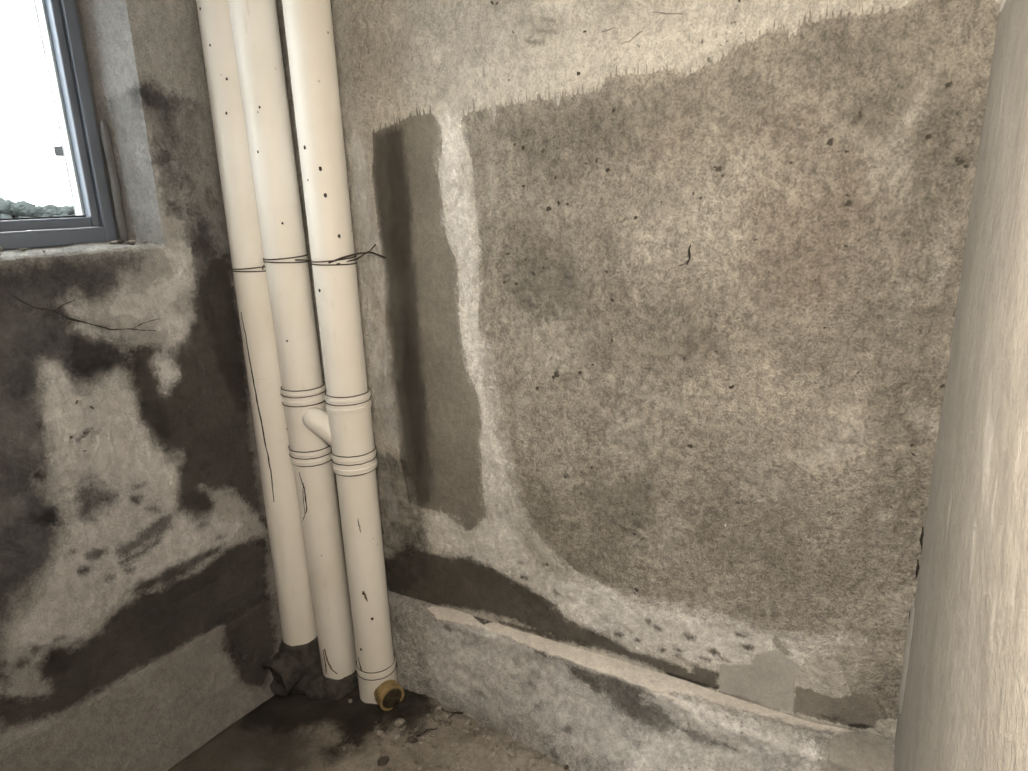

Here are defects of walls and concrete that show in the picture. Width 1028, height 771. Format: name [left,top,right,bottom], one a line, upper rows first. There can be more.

leakage [139,87,168,108]
crack [13,296,160,331]
leakage [362,0,1028,771]
leakage [0,220,277,728]
leakage [244,685,434,756]